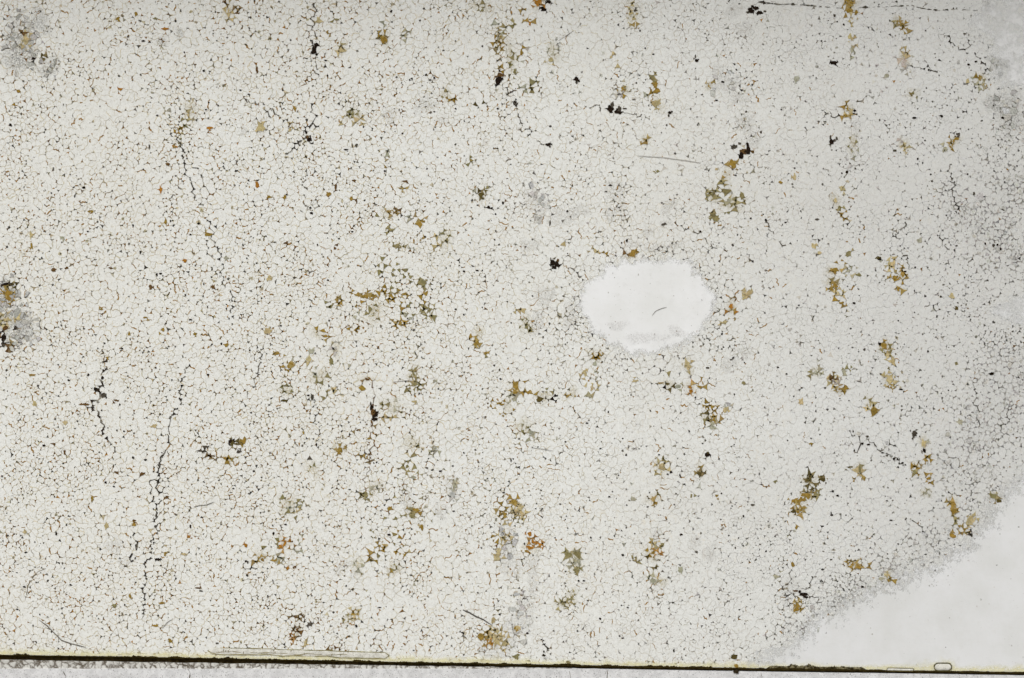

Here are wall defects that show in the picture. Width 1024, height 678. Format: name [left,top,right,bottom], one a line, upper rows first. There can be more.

crack [496,58,550,145]
crack [175,135,237,324]
crack [243,97,319,209]
peeling [272,206,451,402]
peeling [700,142,767,232]
peeling [825,248,861,308]
crack [87,359,116,459]
crack [129,364,190,618]
peeling [787,467,828,529]
crack [849,430,906,466]
peeling [480,492,592,611]
peeling [477,617,529,660]